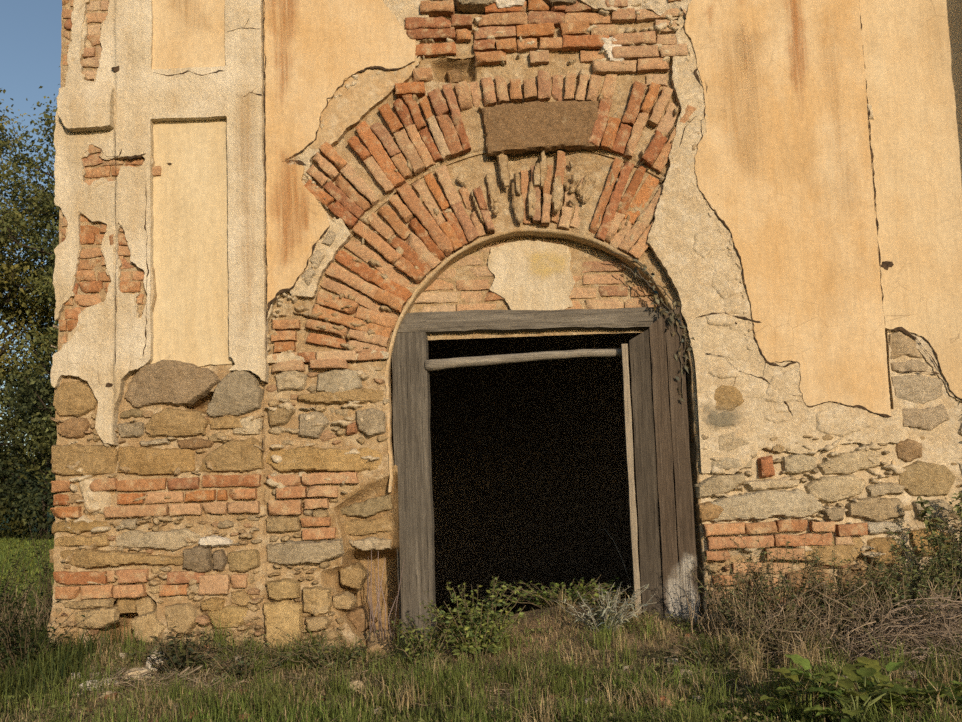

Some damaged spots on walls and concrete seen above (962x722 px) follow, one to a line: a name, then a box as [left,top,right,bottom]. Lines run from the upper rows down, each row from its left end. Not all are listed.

flaking render [60,0,120,88]
flaking render [81,139,172,189]
flaking render [47,200,402,653]
peeling [286,0,962,623]